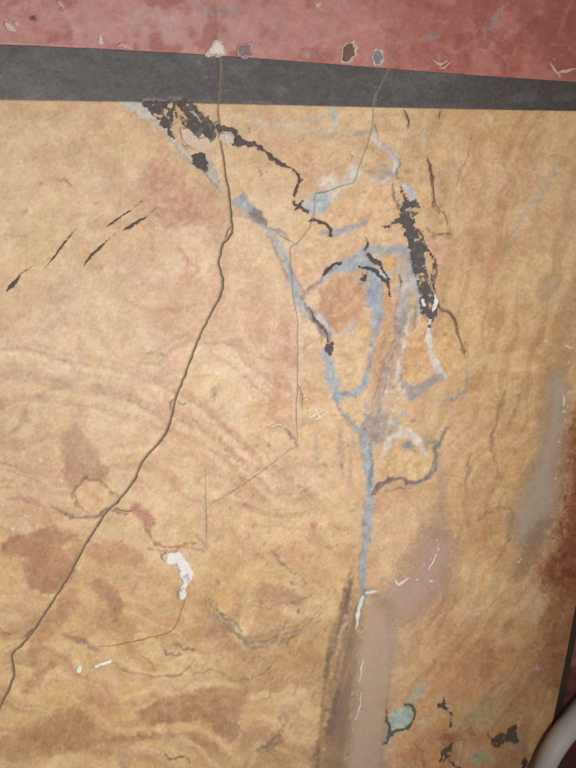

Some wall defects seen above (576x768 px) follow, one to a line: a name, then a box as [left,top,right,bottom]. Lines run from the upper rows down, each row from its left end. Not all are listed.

spalling [341,40,358,63]
peeling [140,99,333,237]
peeling [383,187,439,328]
crack [0,73,234,709]
peeling [162,551,195,600]
peeling [383,703,417,745]
peeling [439,743,460,768]
peeling [489,725,519,747]